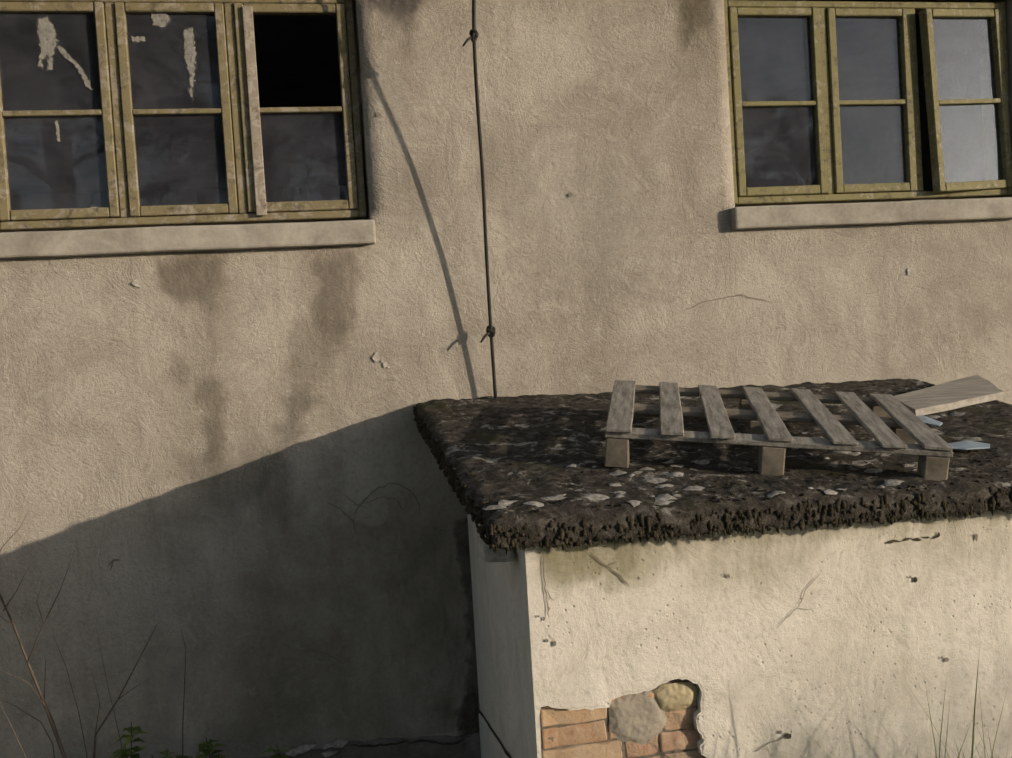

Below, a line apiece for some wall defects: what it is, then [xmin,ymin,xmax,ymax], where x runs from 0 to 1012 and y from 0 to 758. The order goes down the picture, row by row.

crack [685,294,770,310]
crack [776,575,819,629]
crack [344,711,512,758]
flaking render [539,675,714,758]